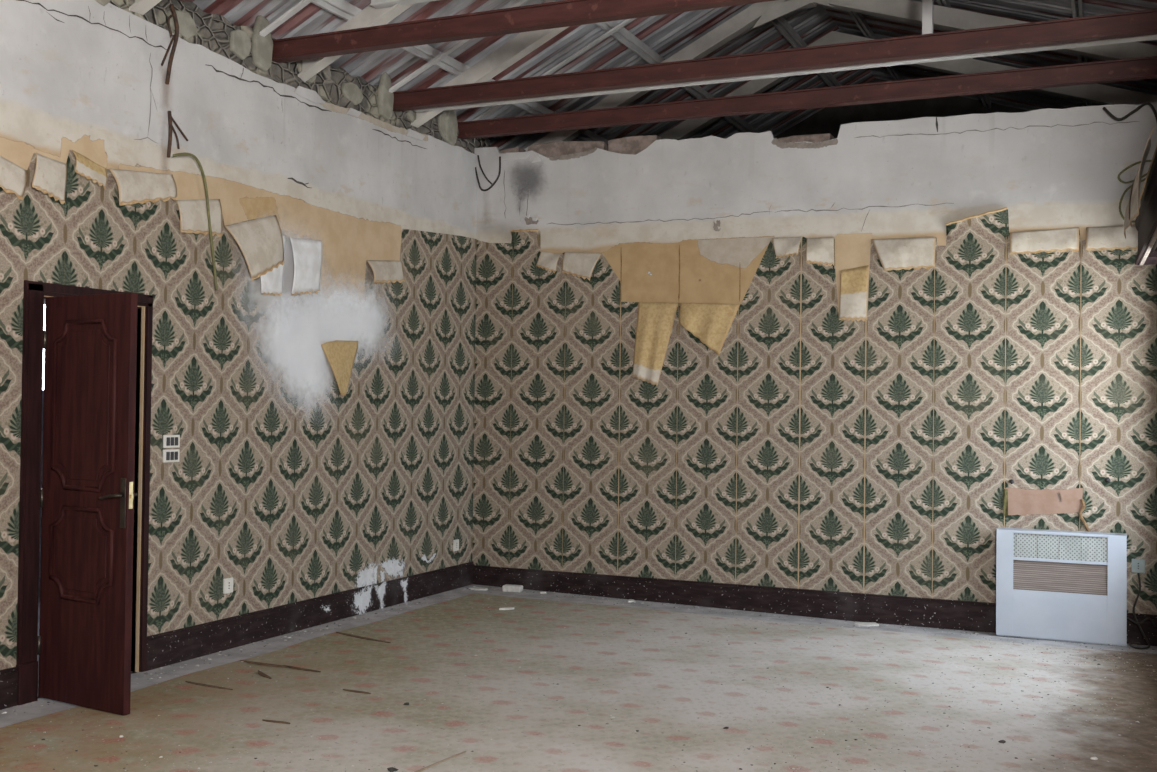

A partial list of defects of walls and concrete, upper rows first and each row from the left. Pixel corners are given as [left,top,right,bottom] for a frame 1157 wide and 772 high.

crack [18,0,167,144]
crack [205,64,332,112]
spalling [294,86,428,141]
crack [372,129,426,149]